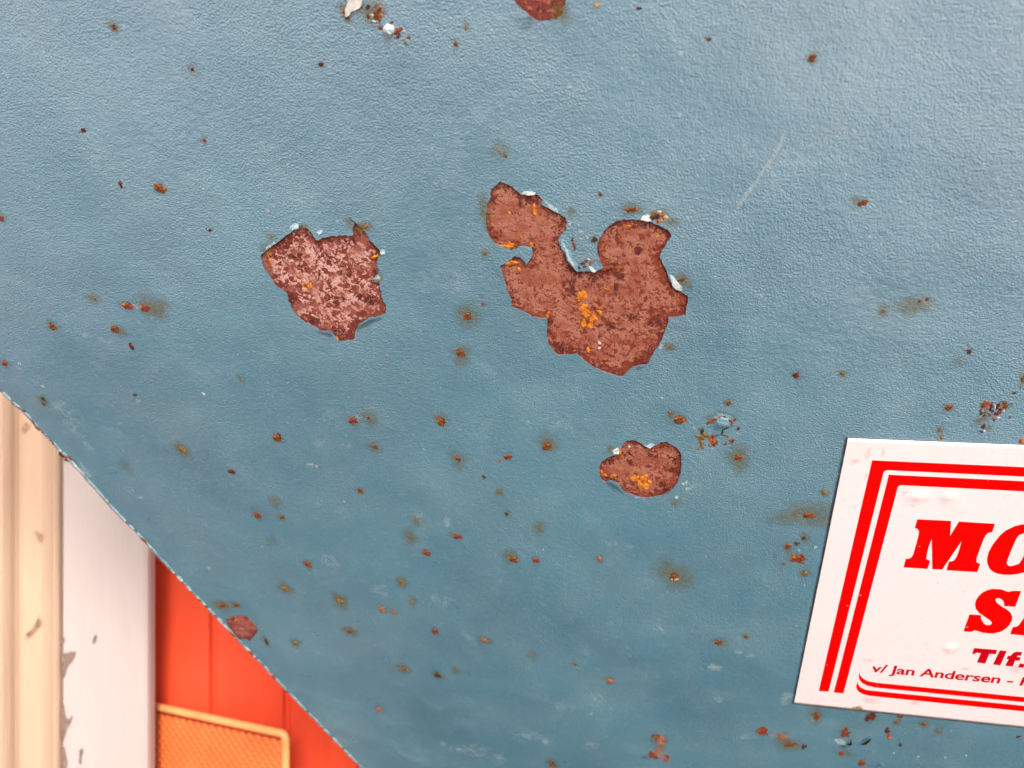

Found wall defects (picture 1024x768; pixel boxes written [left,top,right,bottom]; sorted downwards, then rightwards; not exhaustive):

corrosion [365,4,384,24]
corrosion [483,182,688,376]
corrosion [978,376,1024,433]
spalling [0,389,363,768]
corrosion [782,536,808,576]
corrosion [648,734,670,761]